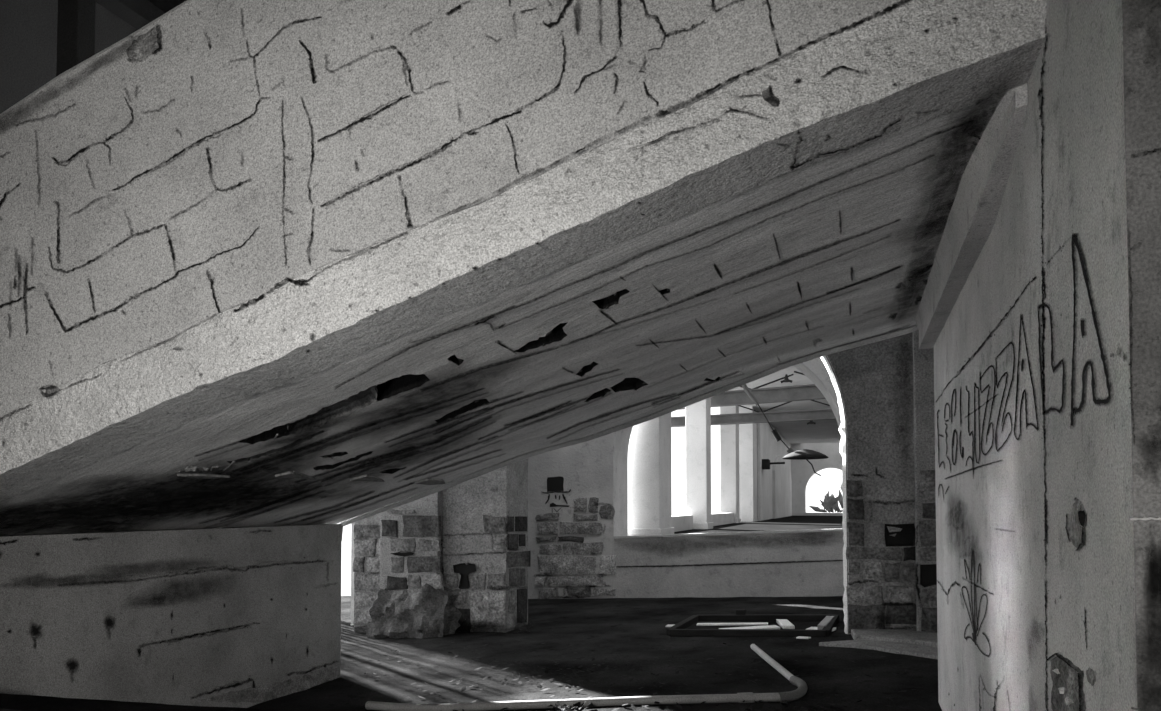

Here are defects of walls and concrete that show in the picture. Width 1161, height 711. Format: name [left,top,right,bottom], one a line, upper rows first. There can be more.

crack [822,65,860,77]
crack [0,0,781,333]
crack [777,112,927,170]
spalling [592,289,630,309]
spalling [514,322,568,352]
spalling [176,374,430,482]
water stain [365,368,500,429]
spalling [585,377,648,402]
crack [934,32,1062,711]
water stain [0,420,338,535]
water stain [1131,552,1161,711]
peeling [1046,653,1097,711]